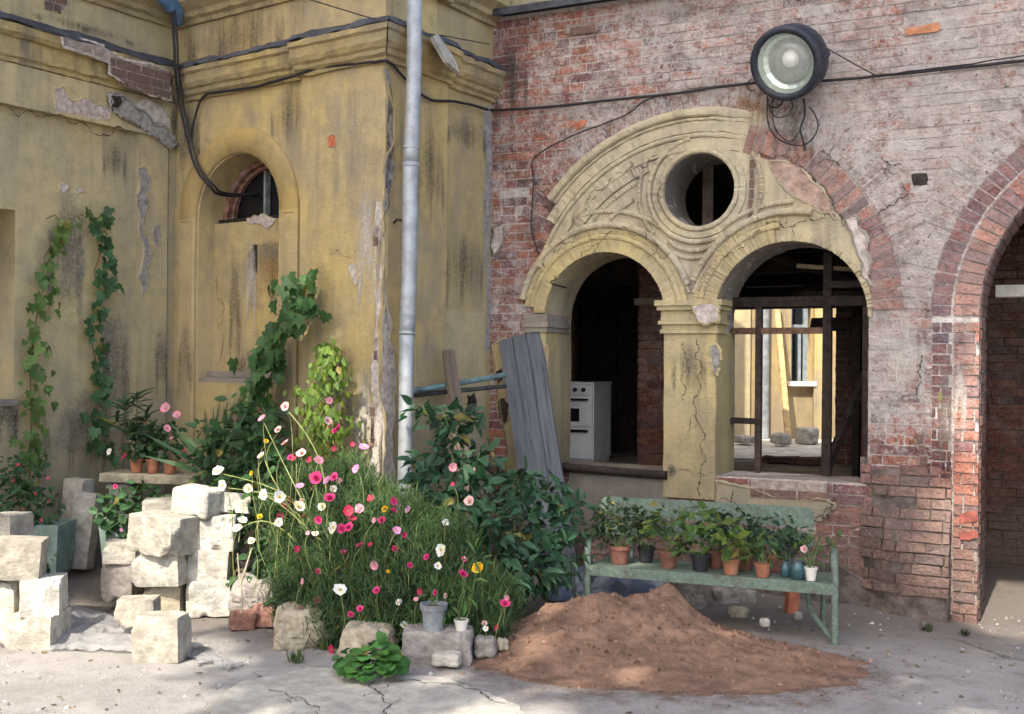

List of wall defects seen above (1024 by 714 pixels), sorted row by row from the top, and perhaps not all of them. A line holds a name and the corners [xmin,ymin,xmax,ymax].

flaking render [52,36,179,150]
flaking render [136,165,162,297]
spalling [367,67,397,489]
crack [554,154,668,263]
flaking render [691,301,721,326]
flaking render [707,343,722,376]
flaking render [742,154,875,287]
crack [878,158,909,215]
crack [673,340,736,503]